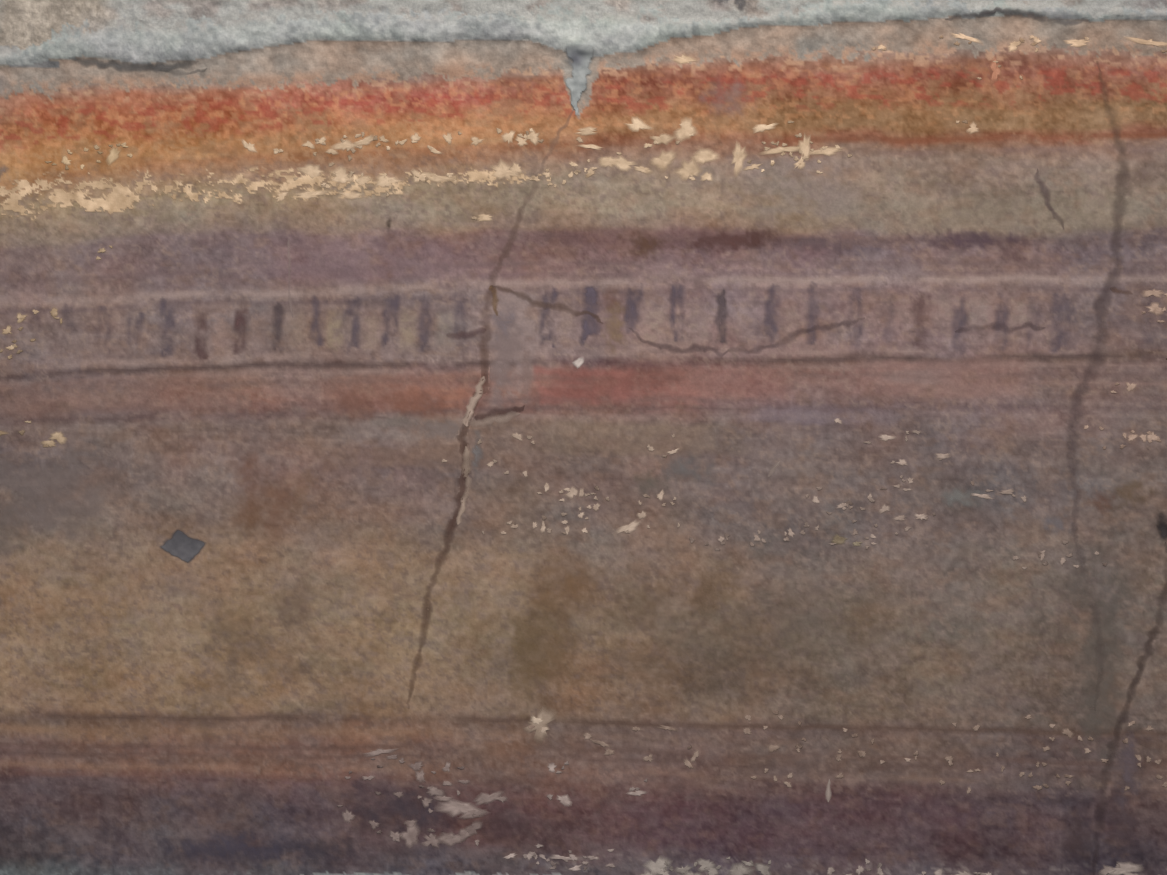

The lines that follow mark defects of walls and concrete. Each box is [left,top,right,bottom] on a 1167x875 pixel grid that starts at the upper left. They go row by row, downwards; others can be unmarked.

peeling [675,55,695,63]
peeling [0,119,717,218]
peeling [733,121,852,174]
crack [447,376,525,547]
peeling [1019,724,1109,790]
peeling [1122,721,1167,787]
peeling [345,749,506,847]
peeling [504,844,615,871]
peeling [641,857,771,875]